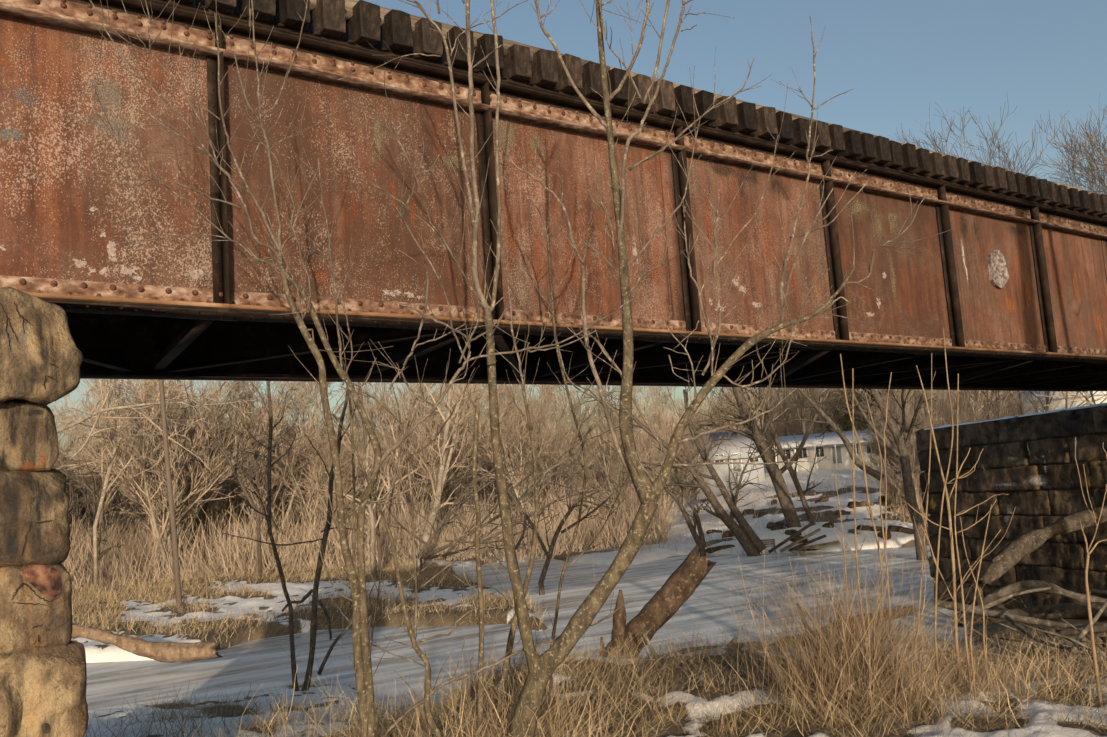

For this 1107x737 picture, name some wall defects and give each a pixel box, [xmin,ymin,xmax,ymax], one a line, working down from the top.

peeling [72,229,142,282]
peeling [186,269,204,280]